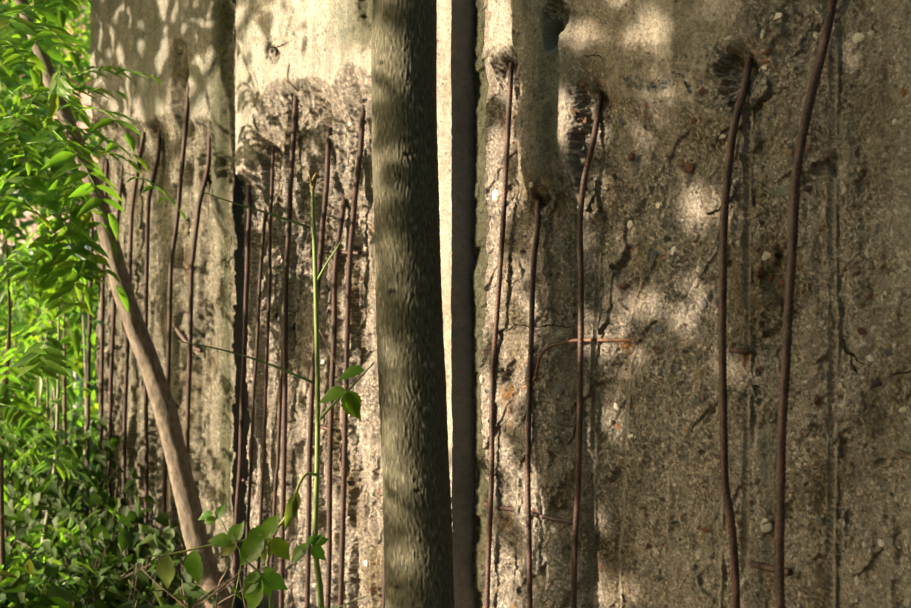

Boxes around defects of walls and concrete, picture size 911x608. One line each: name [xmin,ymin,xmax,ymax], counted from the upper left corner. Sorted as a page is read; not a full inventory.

spalling [93,0,384,608]
spalling [472,0,911,608]